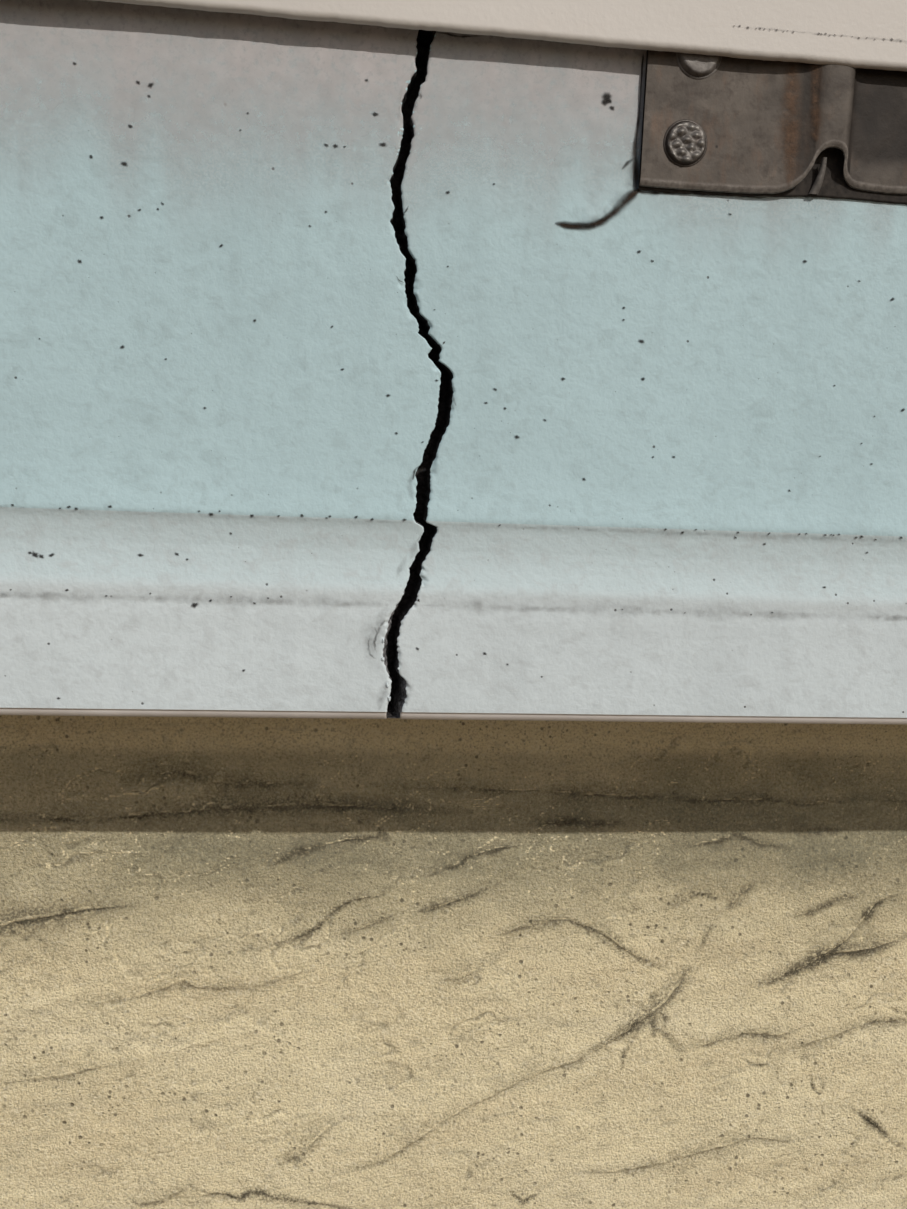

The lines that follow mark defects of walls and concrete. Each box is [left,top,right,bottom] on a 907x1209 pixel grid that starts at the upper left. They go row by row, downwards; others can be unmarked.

crack [381,30,472,718]
crack [556,55,761,229]